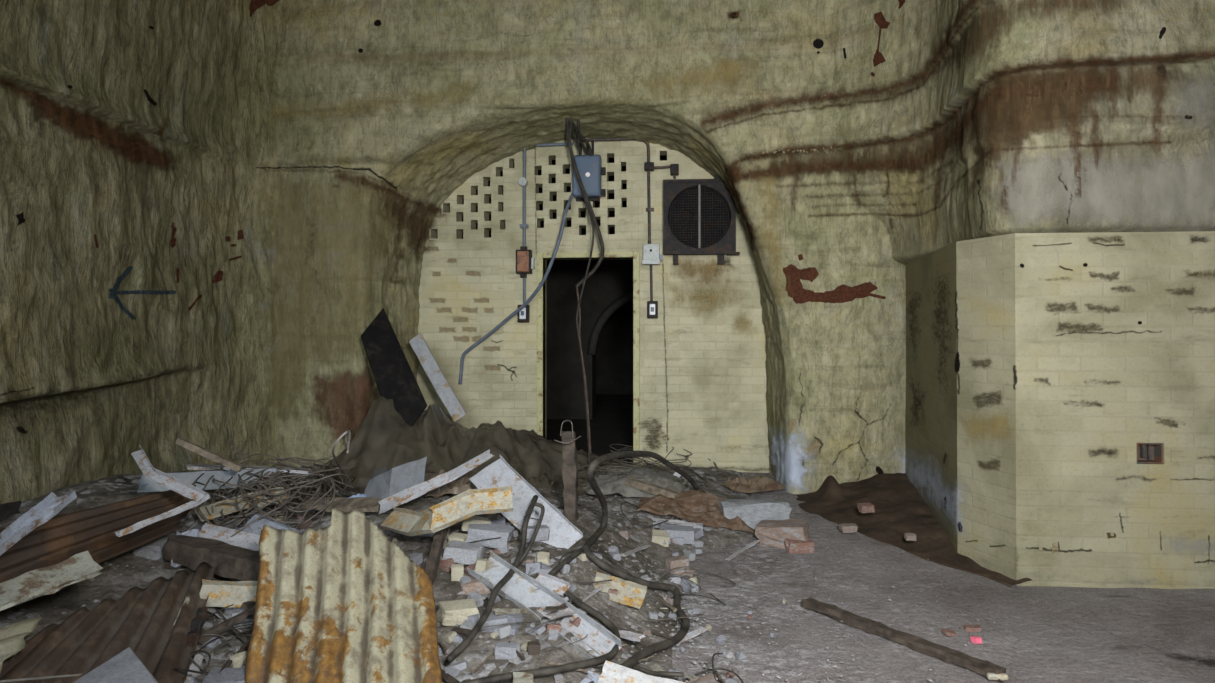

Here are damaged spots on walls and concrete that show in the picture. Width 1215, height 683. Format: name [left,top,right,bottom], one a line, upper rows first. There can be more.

corrosion [701,0,1121,133]
corrosion [0,79,171,169]
crack [256,166,398,192]
corrosion [725,51,1215,250]
damp [771,435,807,486]
crack [833,398,891,480]